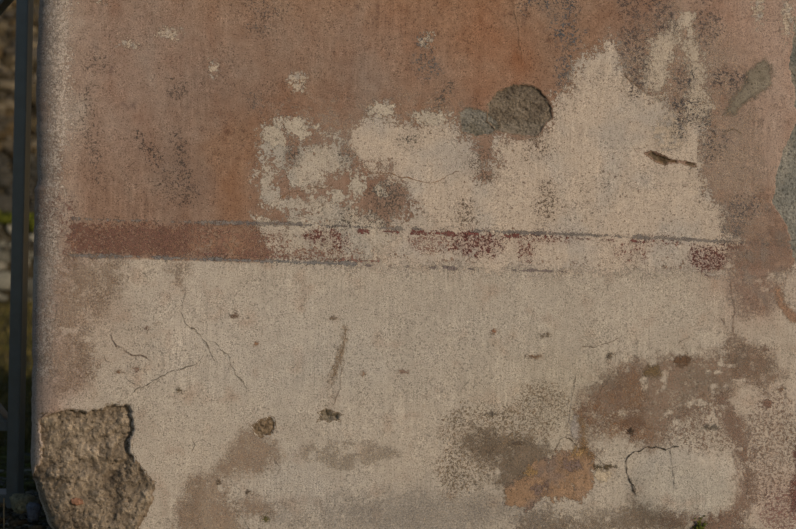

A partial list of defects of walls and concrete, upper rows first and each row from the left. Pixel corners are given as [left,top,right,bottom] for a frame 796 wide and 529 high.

peeling [246,5,765,285]
crack [125,289,242,393]
peeling [781,262,796,312]
spalling [31,401,157,529]
spalling [250,415,277,438]
damp [323,334,796,529]
spalling [504,414,617,513]
crack [555,338,679,495]